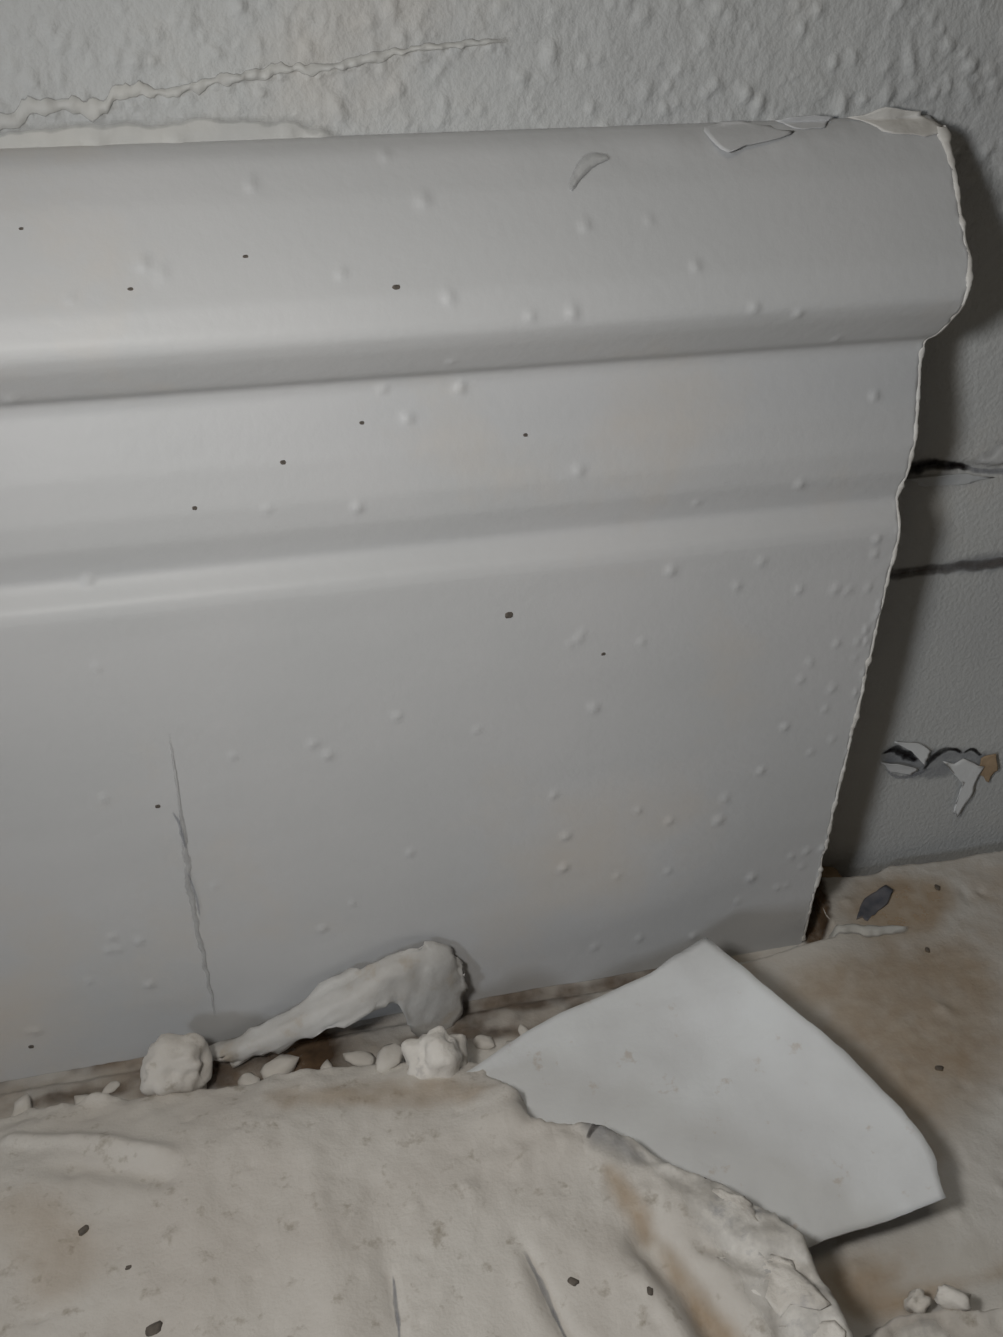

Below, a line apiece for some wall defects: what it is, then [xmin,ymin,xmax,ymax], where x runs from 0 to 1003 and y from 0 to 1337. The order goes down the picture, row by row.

peeling [704,107,943,153]
crack [906,443,1003,487]
crack [890,558,1003,579]
spalling [881,742,998,817]
leakage [805,878,830,944]